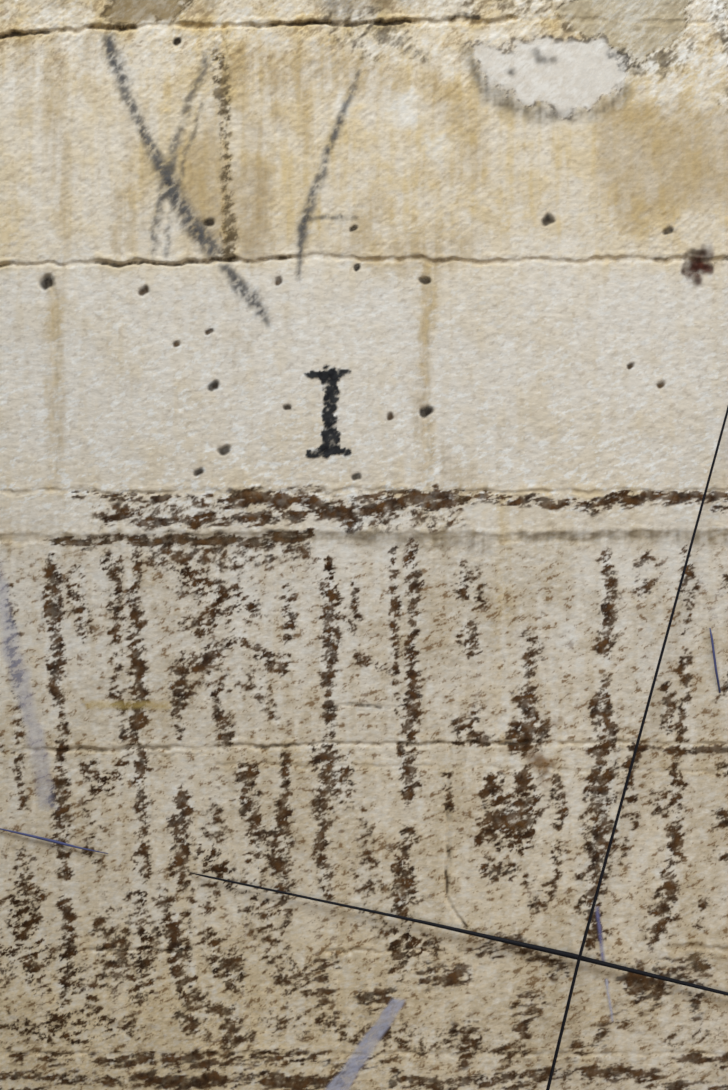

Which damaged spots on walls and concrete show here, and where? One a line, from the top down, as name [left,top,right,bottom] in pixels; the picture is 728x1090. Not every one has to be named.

peeling [103,0,189,24]
rust [683,250,713,284]